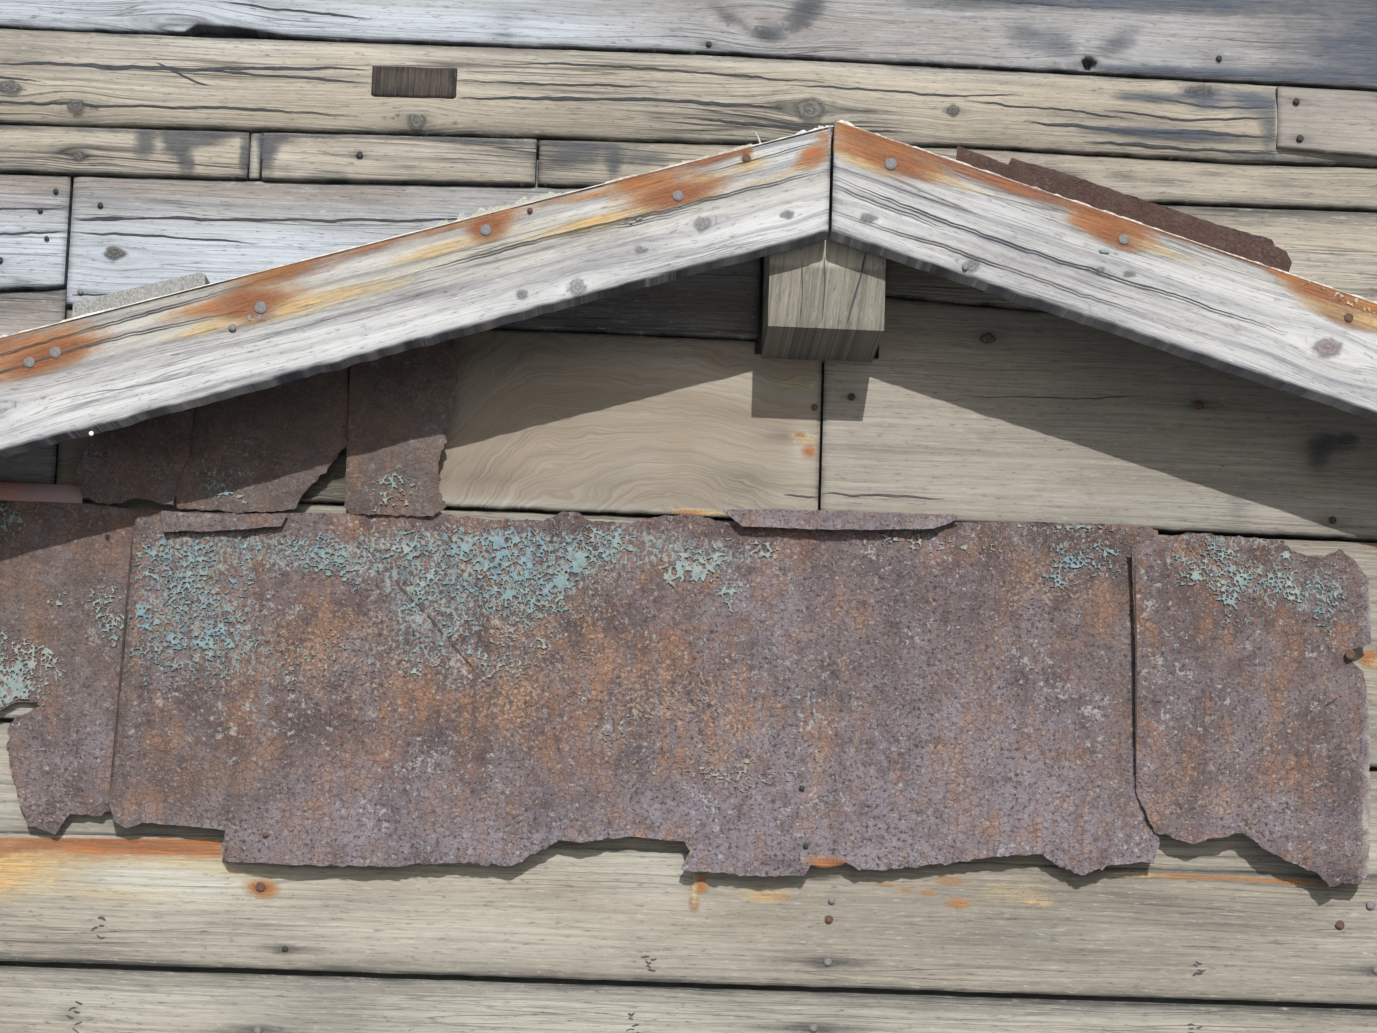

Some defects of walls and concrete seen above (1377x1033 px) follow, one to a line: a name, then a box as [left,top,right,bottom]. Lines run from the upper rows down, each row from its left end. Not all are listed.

rust [543,147,762,236]
rust [786,123,1240,258]
rust [398,208,516,261]
rust [172,239,400,337]
rust [1259,264,1377,329]
rust [0,324,99,379]
rust [0,838,224,895]
rust [809,857,846,866]
rust [1114,873,1316,884]